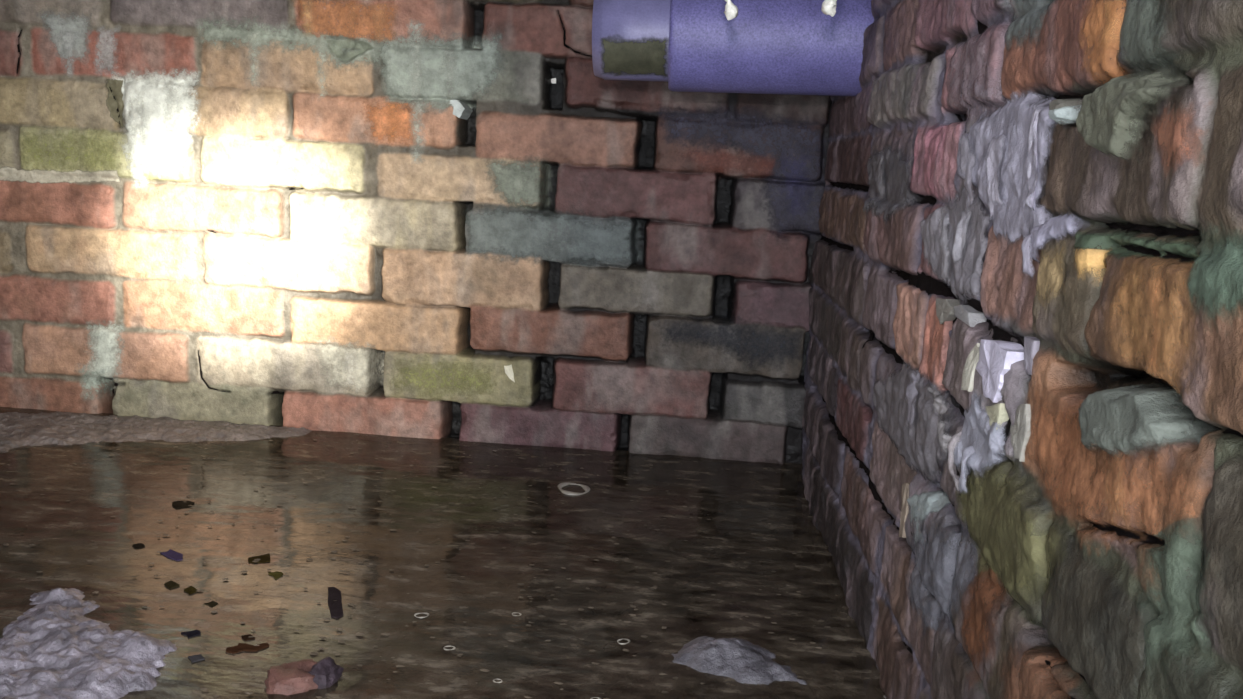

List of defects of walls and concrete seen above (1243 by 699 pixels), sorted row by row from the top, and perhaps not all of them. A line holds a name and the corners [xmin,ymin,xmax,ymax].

crack [558,10,592,57]
crack [198,350,228,392]
flaking render [936,298,1040,462]